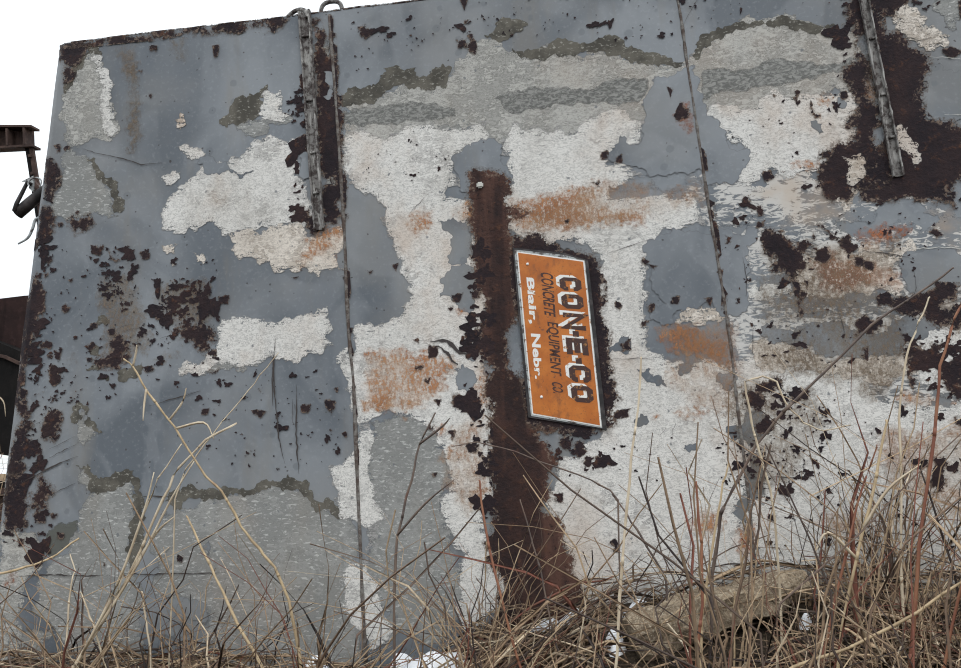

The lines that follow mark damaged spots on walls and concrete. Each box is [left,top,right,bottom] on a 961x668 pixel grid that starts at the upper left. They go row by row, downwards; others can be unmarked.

peeling [51,51,121,220]
peeling [160,88,344,277]
corrosion [294,15,349,258]
corrosion [799,0,961,209]
corrosion [2,256,64,547]
peeling [0,467,145,668]
peeling [178,306,333,376]
corrosion [351,168,643,640]
corrosion [641,195,961,482]
peeling [750,370,923,585]
corrosion [884,417,961,494]
peeling [920,379,961,576]